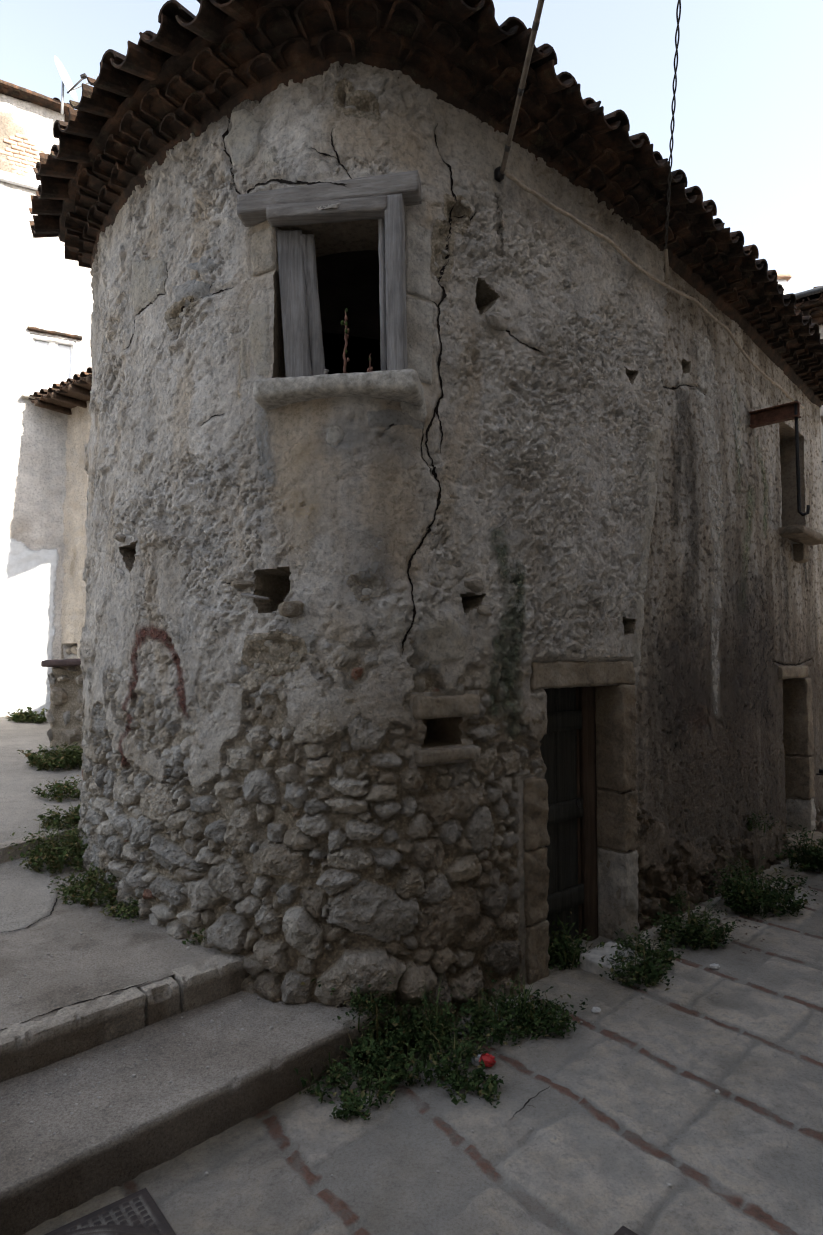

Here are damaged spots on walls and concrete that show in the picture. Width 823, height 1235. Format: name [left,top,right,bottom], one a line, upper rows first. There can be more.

spalling [0,133,44,176]
crack [222,117,352,194]
crack [381,124,476,655]
spalling [346,570,387,602]
spalling [77,627,548,1033]
spalling [633,789,823,931]